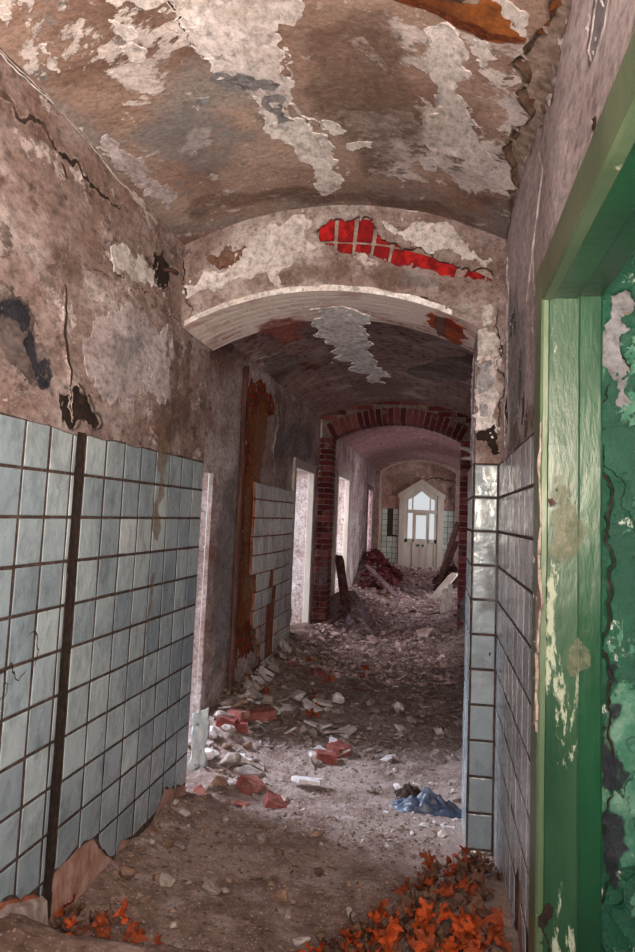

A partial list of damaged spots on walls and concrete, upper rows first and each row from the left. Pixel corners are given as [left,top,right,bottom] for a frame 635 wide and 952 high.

peeling [492,0,530,38]
crack [0,50,157,224]
peeling [106,0,372,196]
peeling [413,21,505,176]
peeling [109,237,170,293]
peeling [182,209,493,299]
leakage [0,299,53,390]
peeling [0,284,174,430]
peeling [310,306,391,384]
peeling [405,292,528,455]
peeling [602,289,635,532]
peeling [532,422,544,732]